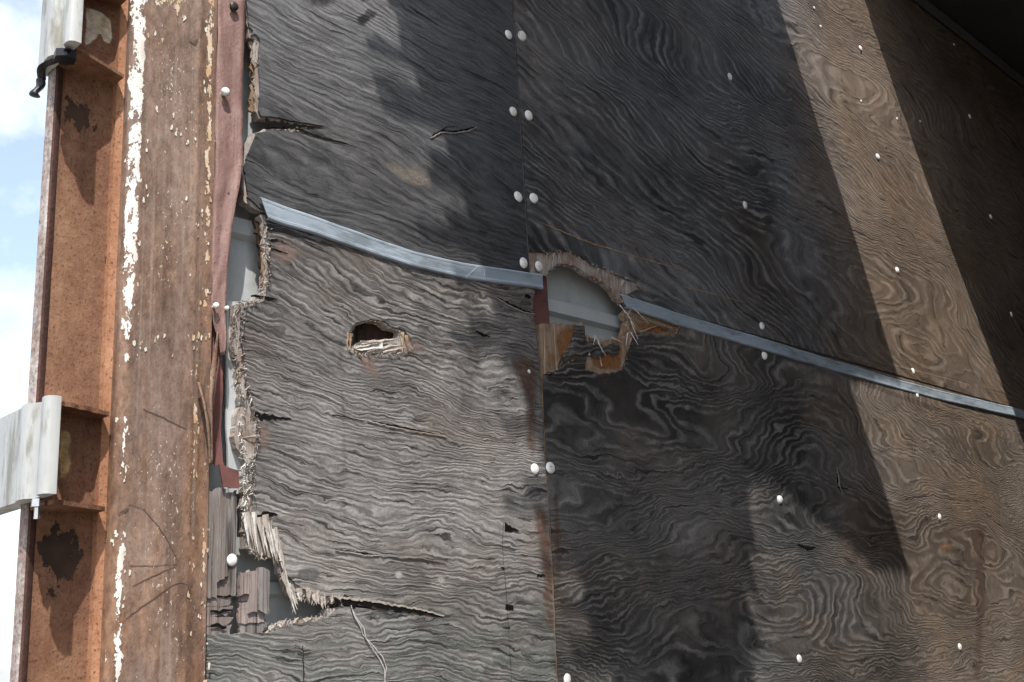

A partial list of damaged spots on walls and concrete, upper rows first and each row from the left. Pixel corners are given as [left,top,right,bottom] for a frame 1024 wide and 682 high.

peeling [121,0,186,362]
peeling [170,0,219,264]
crack [265,117,357,147]
crack [431,126,477,138]
spalling [346,320,414,366]
spalling [542,249,680,377]
spalling [241,512,344,632]
crack [334,595,457,618]